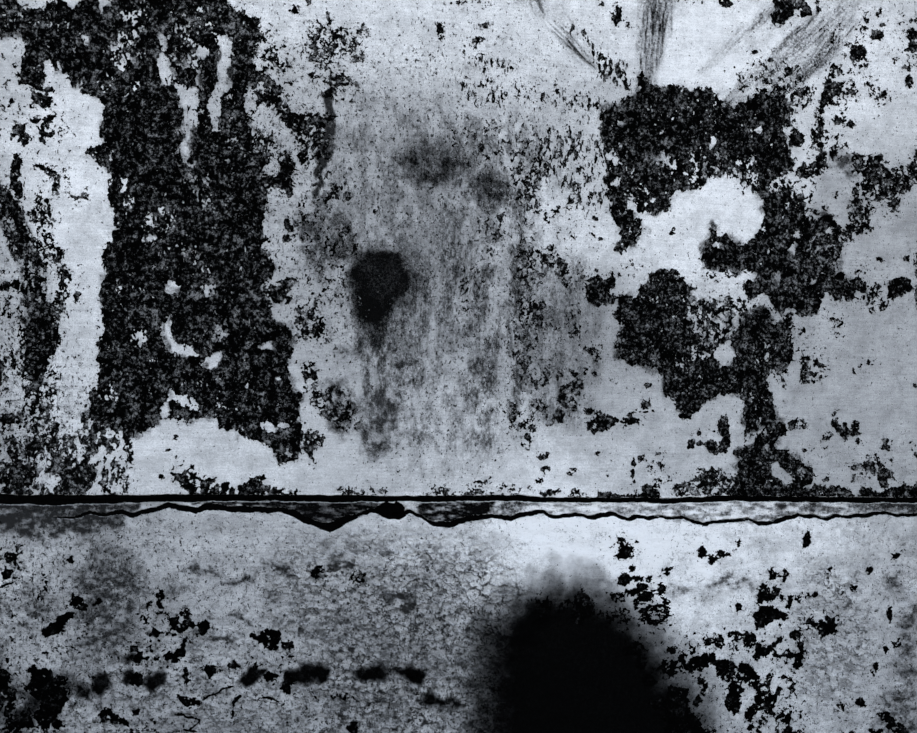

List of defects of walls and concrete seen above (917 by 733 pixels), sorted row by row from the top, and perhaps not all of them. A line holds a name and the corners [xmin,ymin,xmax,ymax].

peeling [769,0,813,31]
peeling [0,0,361,468]
peeling [535,68,917,497]
leakage [163,460,400,523]
crack [0,494,917,533]
peeling [0,499,544,733]
leakage [511,588,717,733]
peeling [605,528,902,733]
spalling [868,696,909,733]